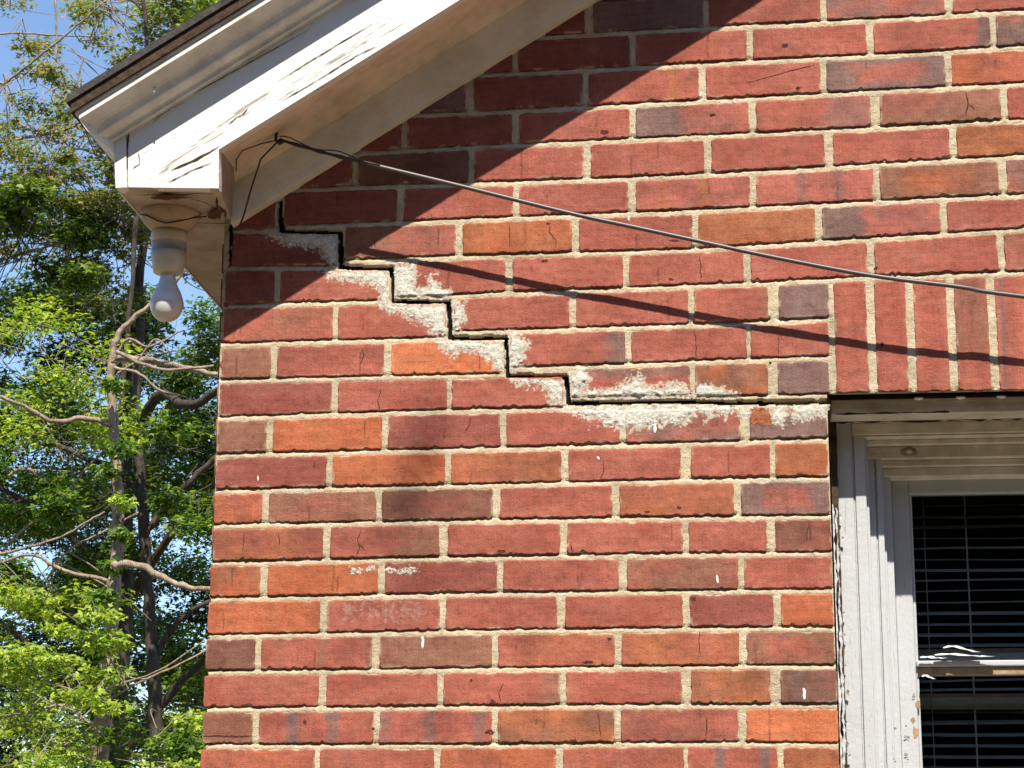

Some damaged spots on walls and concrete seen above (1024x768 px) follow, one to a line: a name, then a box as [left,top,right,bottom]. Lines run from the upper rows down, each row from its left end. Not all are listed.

crack [279,200,773,407]
peeling [829,409,851,768]